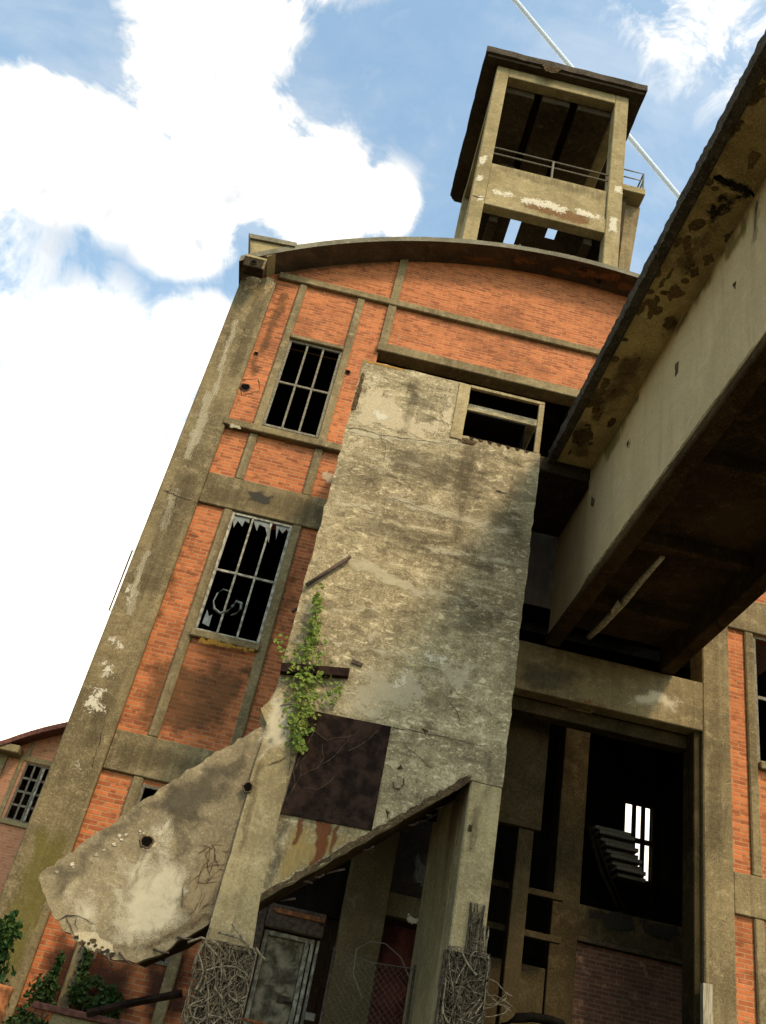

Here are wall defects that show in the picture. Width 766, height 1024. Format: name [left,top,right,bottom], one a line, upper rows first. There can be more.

peeling [477,189,618,232]
water stain [706,193,743,227]
crack [349,428,458,457]
water stain [388,495,516,534]
water stain [426,546,520,567]
water stain [343,554,510,616]
peeling [83,660,115,713]
corrosion [281,819,343,882]
spalling [74,931,130,966]